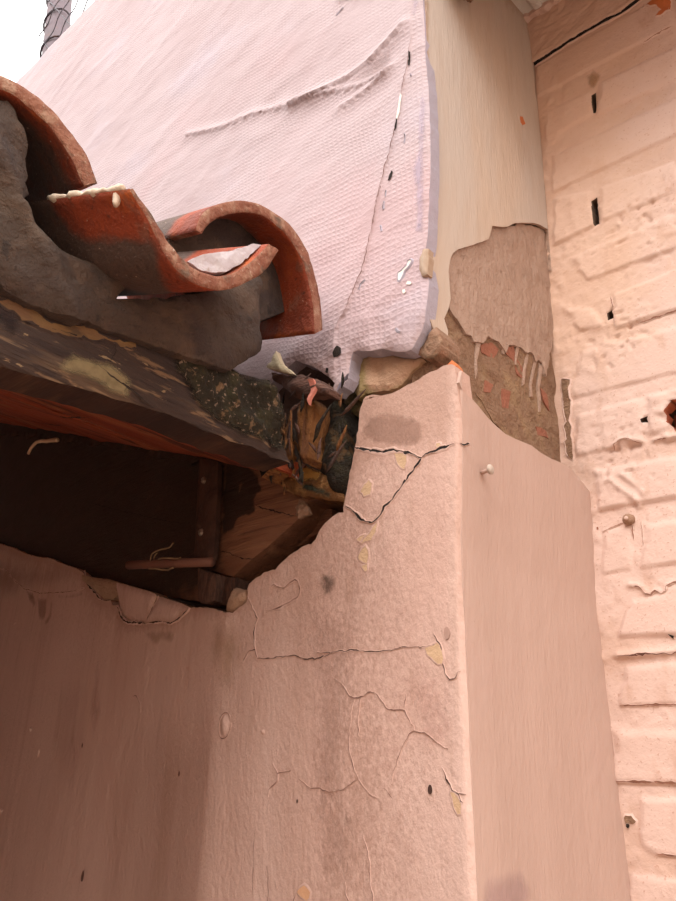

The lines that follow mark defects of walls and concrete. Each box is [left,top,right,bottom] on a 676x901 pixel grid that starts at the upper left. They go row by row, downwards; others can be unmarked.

spalling [397,249,434,282]
spalling [266,351,297,376]
spalling [444,224,575,462]
crack [344,442,470,524]
crack [84,570,191,625]
peeling [82,575,194,623]
crack [242,577,466,803]